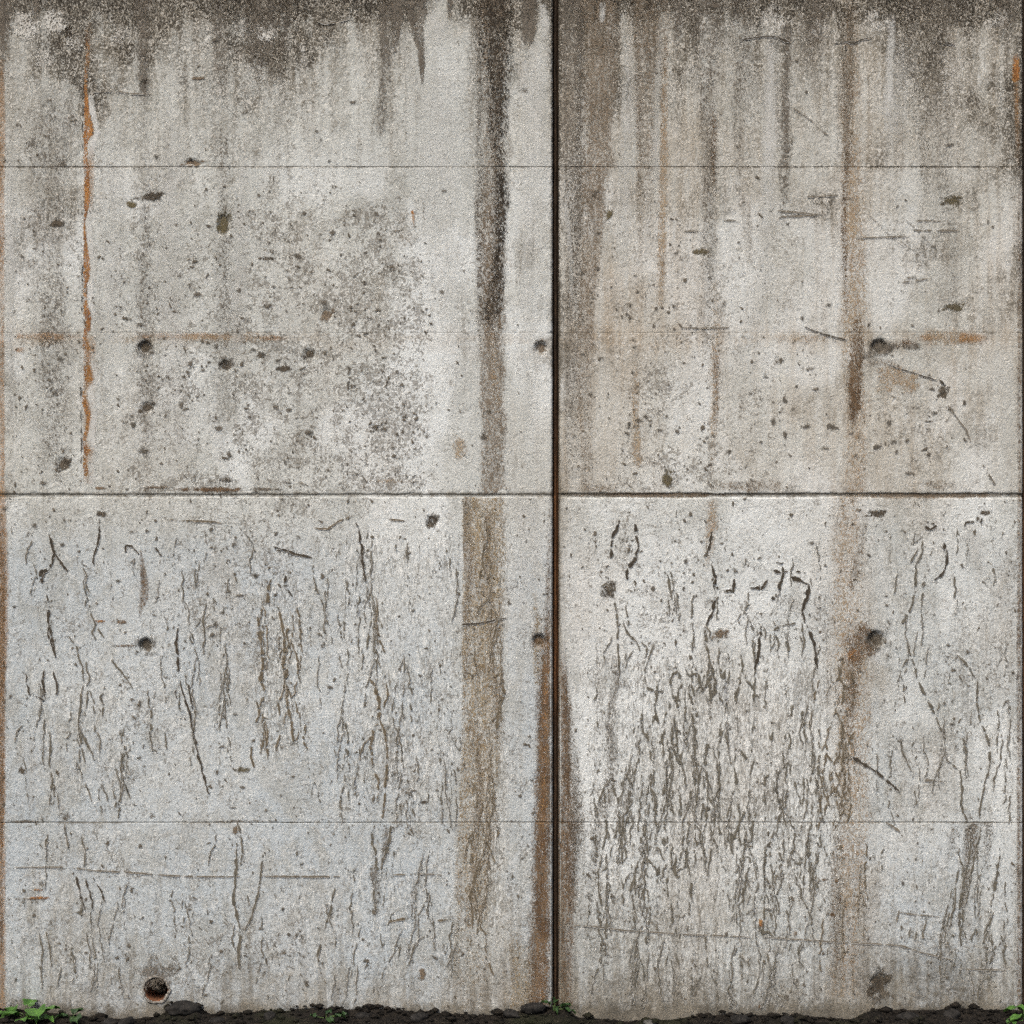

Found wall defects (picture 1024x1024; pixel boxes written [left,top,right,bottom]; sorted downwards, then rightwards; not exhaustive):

leakage [0,0,14,79]
corrosion [82,18,94,479]
leakage [28,0,150,101]
leakage [213,0,333,99]
leakage [474,0,780,498]
leakage [760,0,833,278]
leakage [879,0,1018,295]
leakage [864,481,999,499]
crack [14,515,509,1003]
corrosion [505,530,585,1009]
crack [565,511,1017,1011]